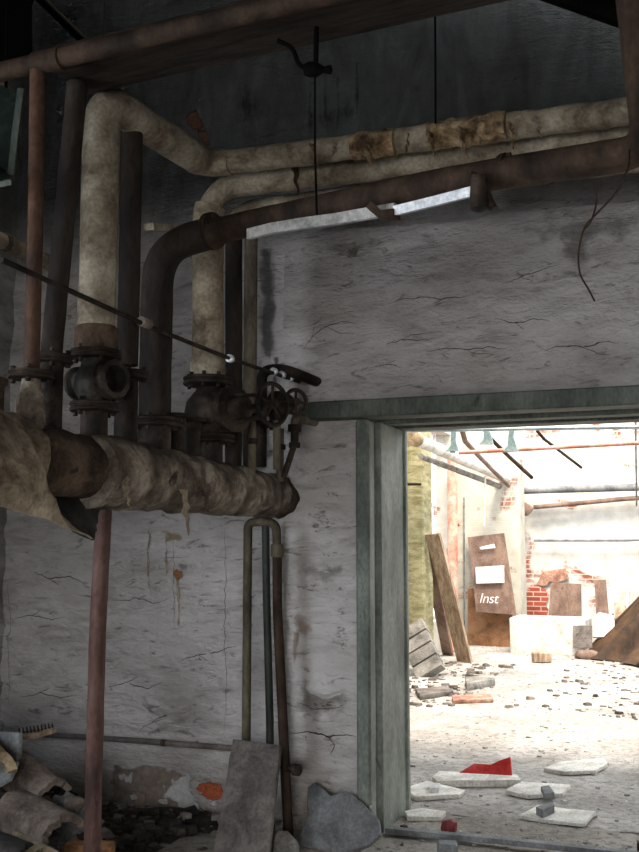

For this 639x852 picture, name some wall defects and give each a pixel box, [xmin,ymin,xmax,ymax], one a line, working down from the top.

water stain [260,250,278,364]
crack [544,341,613,355]
crack [117,534,175,625]
corrosion [165,552,183,609]
crack [7,585,80,706]
crack [289,731,356,752]
peeling [112,765,223,812]